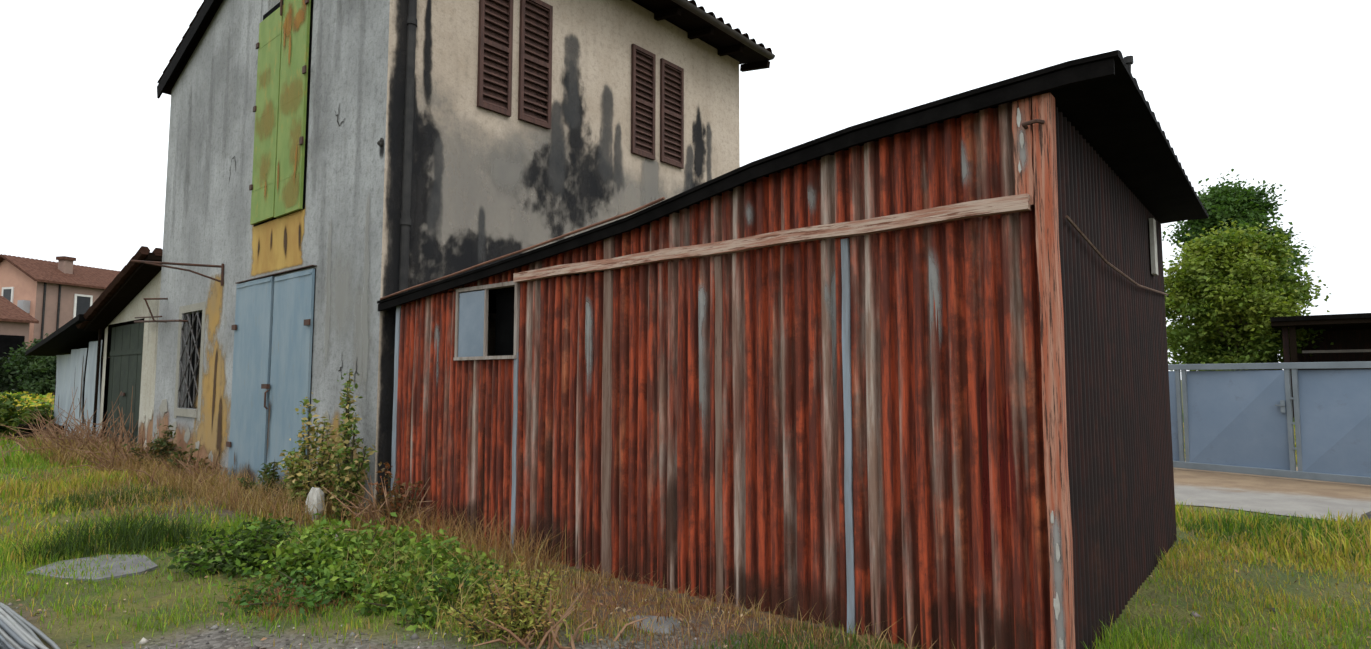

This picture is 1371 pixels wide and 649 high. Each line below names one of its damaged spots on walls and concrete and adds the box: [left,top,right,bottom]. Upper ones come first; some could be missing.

rust [283,0,306,64]
leakage [684,109,712,192]
leakage [325,0,667,509]
rust [408,417,593,568]
rust [622,483,1032,649]
rust [980,374,1015,570]